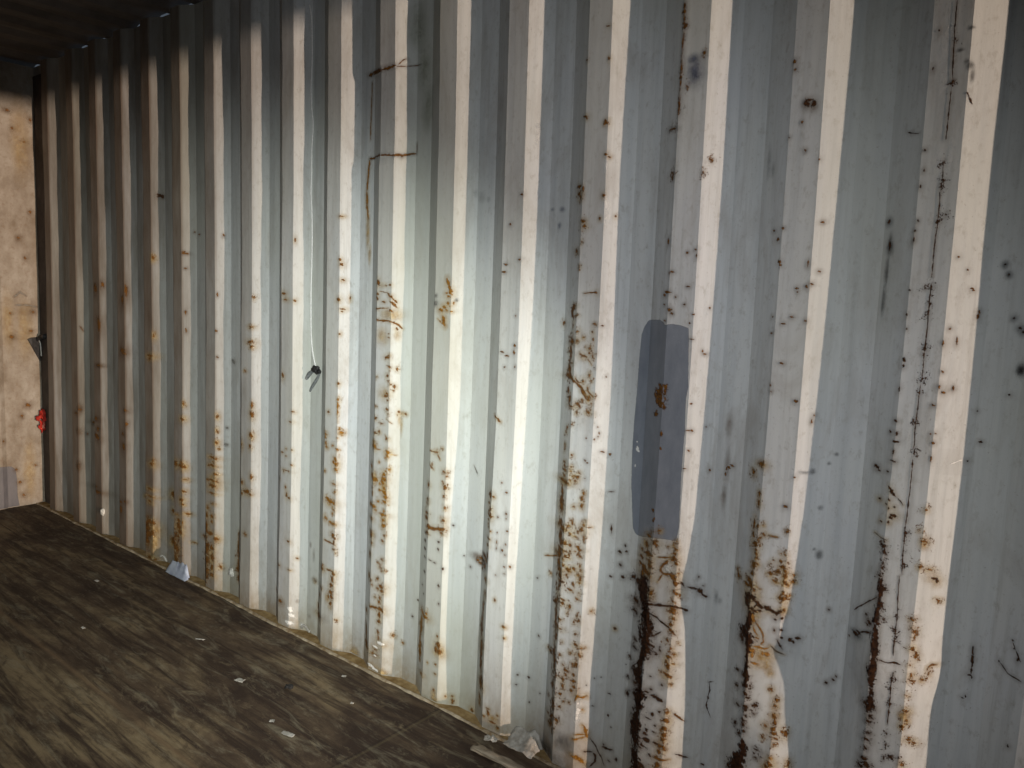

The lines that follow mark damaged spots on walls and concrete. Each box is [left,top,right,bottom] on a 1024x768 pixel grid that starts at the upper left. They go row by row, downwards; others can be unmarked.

corrosion [946,0,968,139]
corrosion [376,280,403,338]
corrosion [435,278,455,326]
corrosion [145,415,247,582]
corrosion [318,562,340,623]
corrosion [324,398,346,558]
corrosion [351,352,406,675]
corrosion [412,446,454,675]
corrosion [545,304,611,734]
corrosion [609,525,684,768]
corrosion [726,518,801,768]
corrosion [852,161,958,768]